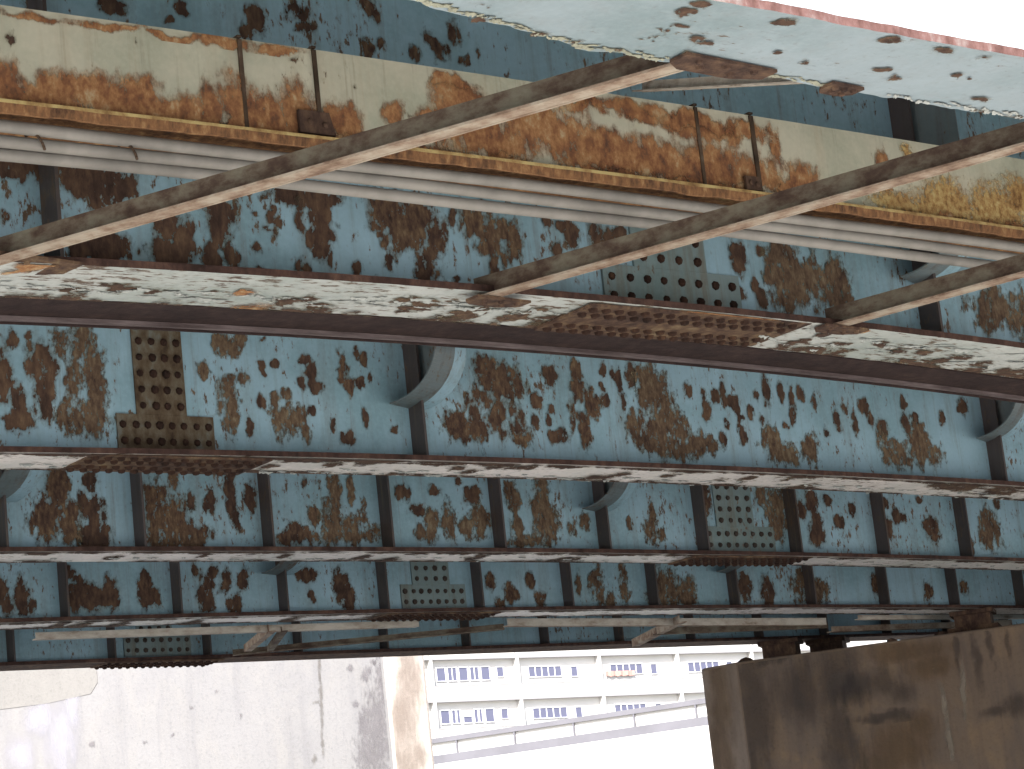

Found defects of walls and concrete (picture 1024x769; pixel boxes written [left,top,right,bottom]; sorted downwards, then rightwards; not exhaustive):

peeling [416,0,670,62]
corrosion [0,59,364,138]
corrosion [416,96,819,193]
peeling [768,74,827,86]
peeling [887,93,1023,119]
corrosion [68,202,241,267]
corrosion [253,188,342,272]
corrosion [368,189,523,281]
peeling [0,280,571,320]
corrosion [0,326,116,440]
peeling [859,338,1024,369]
corrosion [0,354,1024,630]